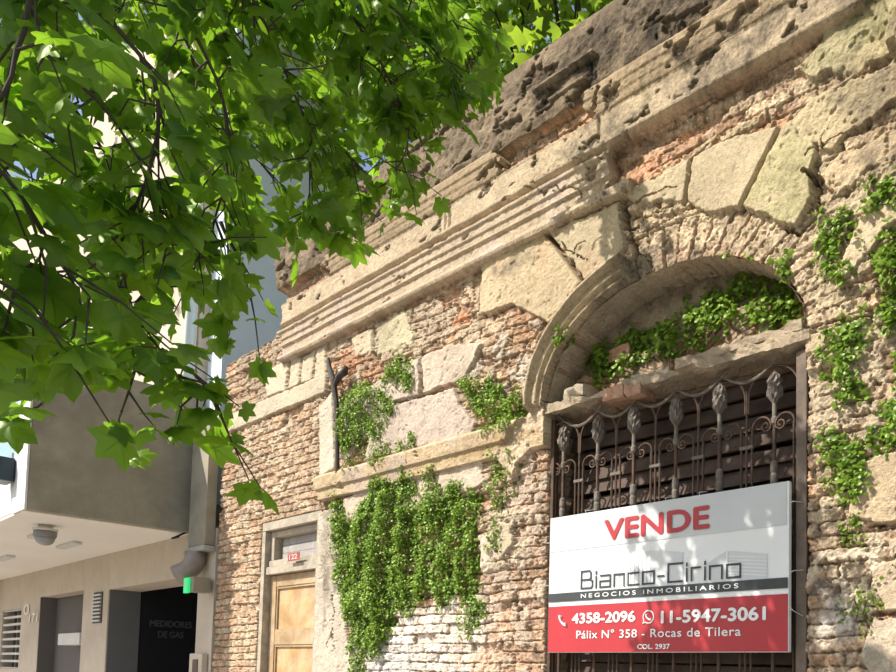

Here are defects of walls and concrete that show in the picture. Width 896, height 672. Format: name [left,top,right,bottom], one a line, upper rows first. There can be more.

crack [561,240,589,261]